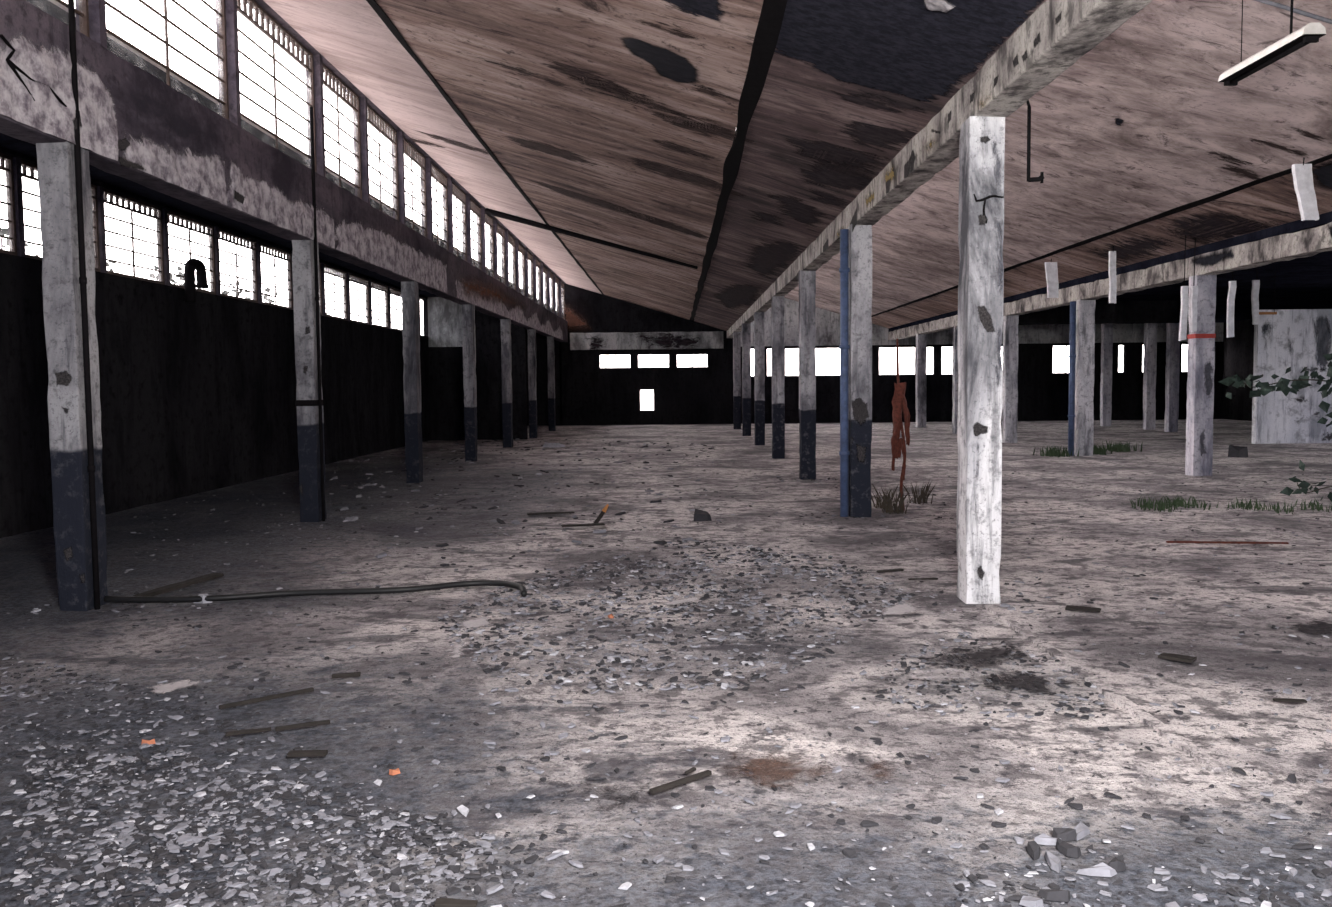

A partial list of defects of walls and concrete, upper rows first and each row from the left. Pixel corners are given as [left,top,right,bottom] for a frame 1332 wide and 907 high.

crack [0,34,67,107]
leakage [619,13,740,102]
flaking render [0,36,589,340]
leakage [410,130,490,155]
leakage [992,143,1001,186]